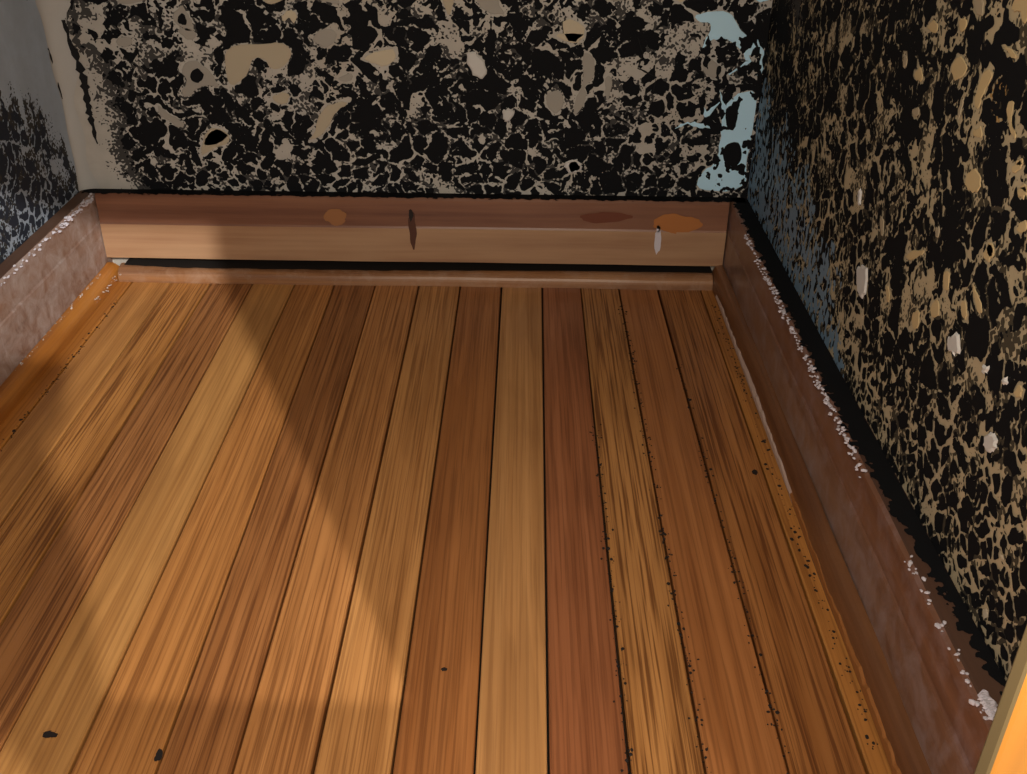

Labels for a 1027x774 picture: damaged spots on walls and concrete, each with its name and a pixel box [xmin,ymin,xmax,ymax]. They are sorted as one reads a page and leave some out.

peeling [695,11,764,79]
leakage [190,68,204,83]
leakage [725,106,738,130]
leakage [731,96,743,116]
peeling [675,91,757,192]
leakage [724,142,746,166]
leakage [0,84,79,264]
leakage [843,433,857,460]